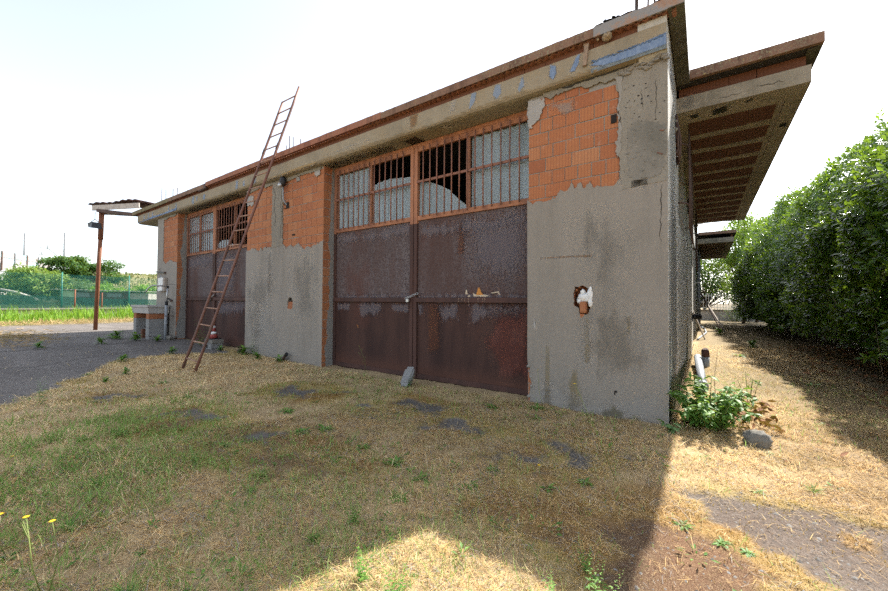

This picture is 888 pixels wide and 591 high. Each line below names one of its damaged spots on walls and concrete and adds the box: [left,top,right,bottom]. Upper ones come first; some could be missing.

flaking render [527,32,682,204]
flaking render [139,193,178,263]
flaking render [236,162,324,251]
spalling [574,286,593,318]
corrosion [489,310,528,375]